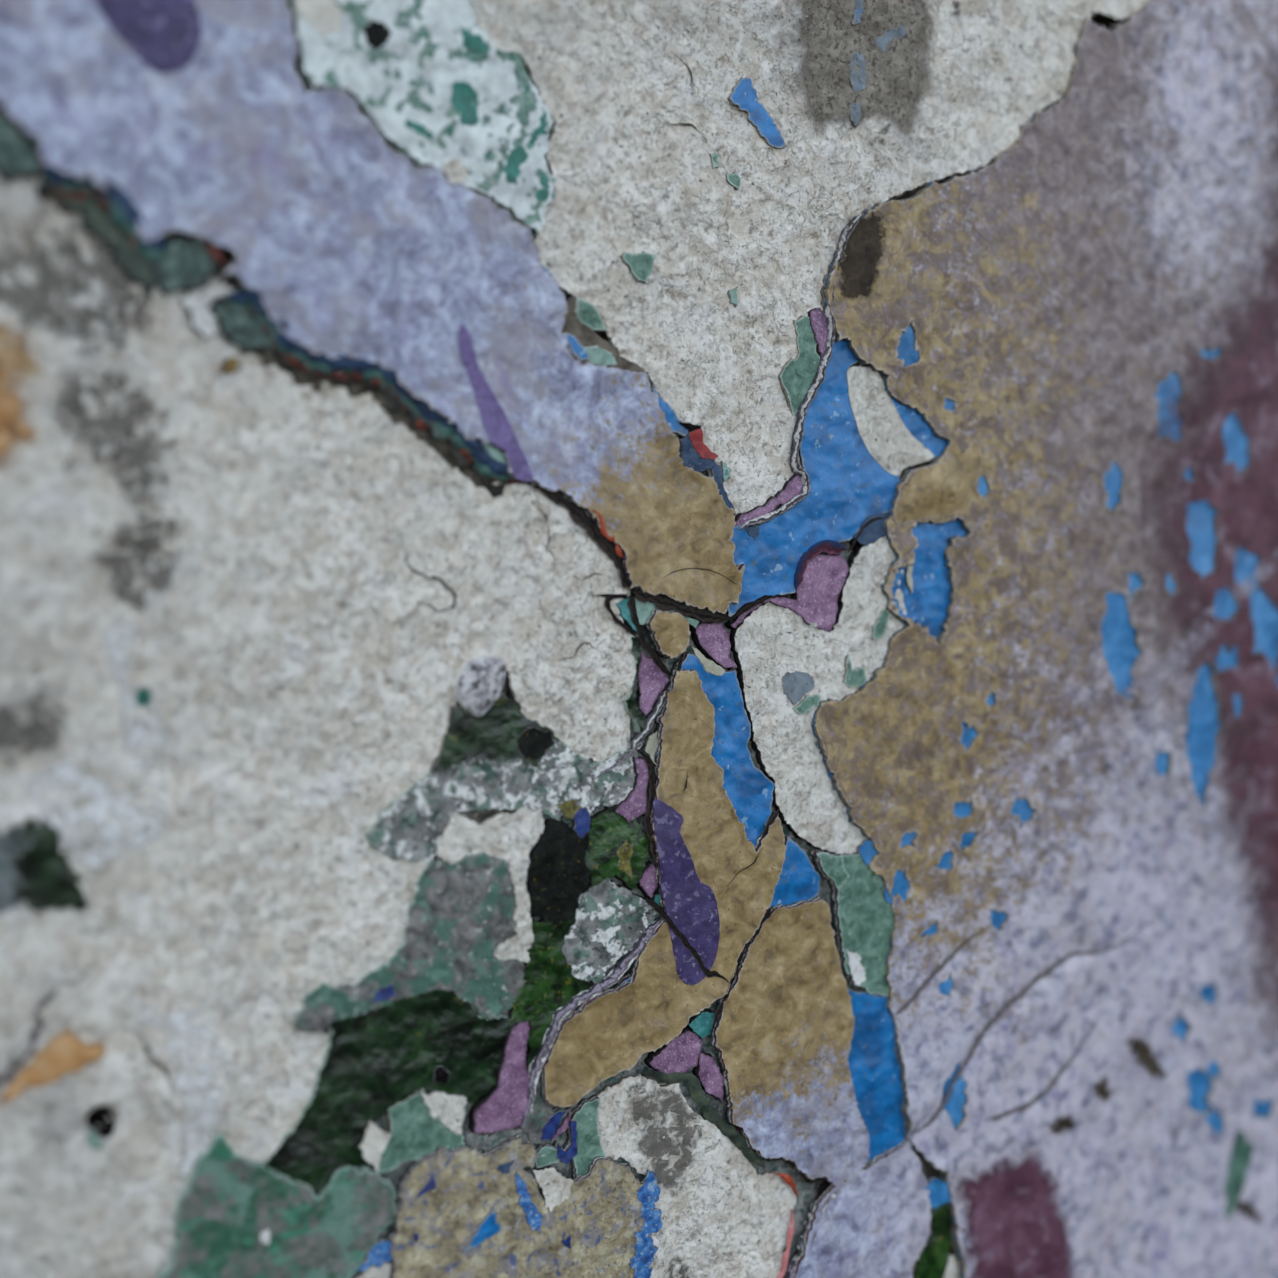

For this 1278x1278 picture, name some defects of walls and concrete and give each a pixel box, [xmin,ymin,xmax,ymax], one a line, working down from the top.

crack [672,55,708,140]
spalling [288,0,1150,540]
crack [387,519,457,626]
spalling [0,113,989,1278]
crack [530,485,791,677]
peeling [1100,572,1143,703]
peeling [1187,499,1217,578]
peeling [1184,643,1243,807]
peeling [1209,547,1278,685]
crack [0,960,96,1085]
crack [125,1030,173,1094]
crack [636,749,780,1160]